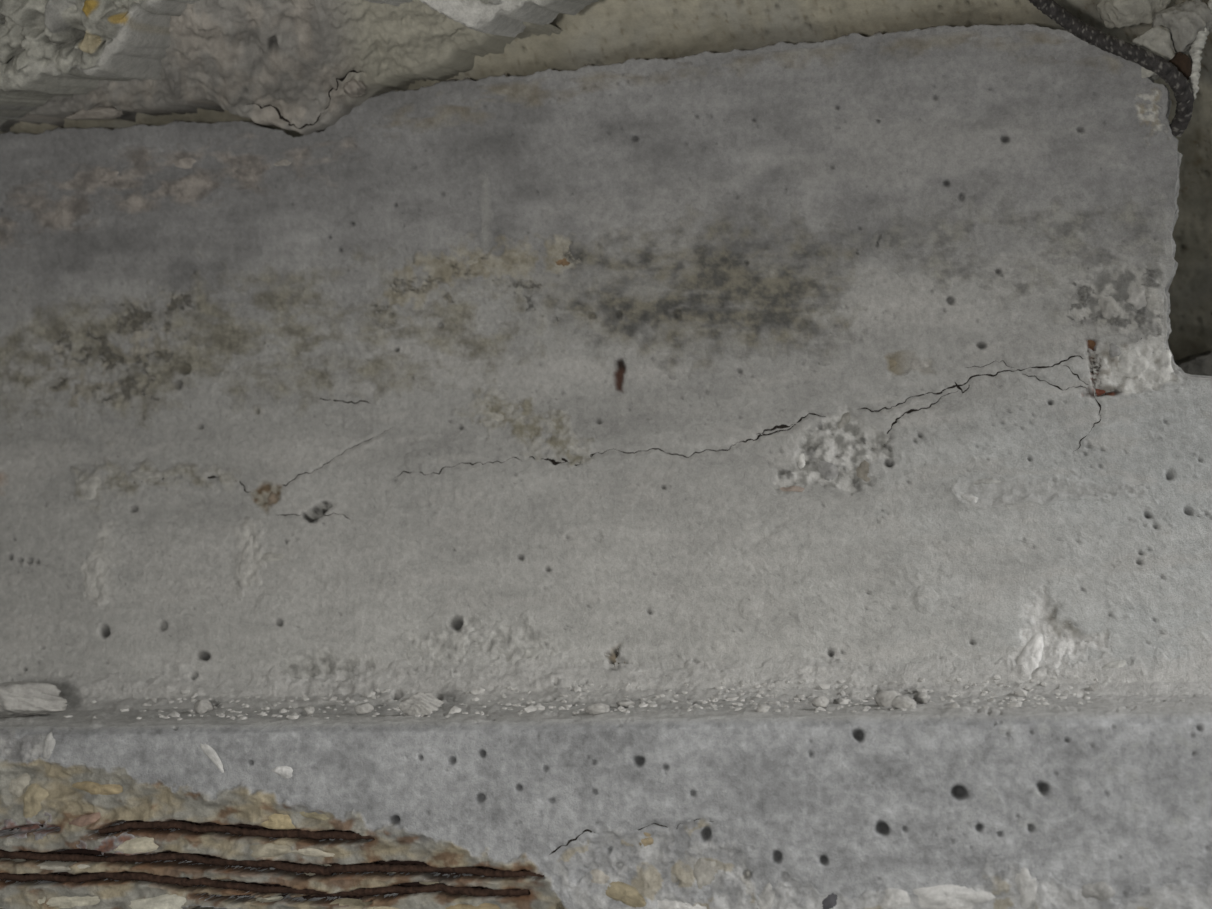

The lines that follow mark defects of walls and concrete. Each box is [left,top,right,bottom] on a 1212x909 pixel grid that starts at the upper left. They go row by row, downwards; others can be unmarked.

corrosion [1168,52,1192,81]
spalling [1188,27,1210,99]
crack [861,356,1101,453]
crack [394,413,825,478]
corrosion [0,812,61,840]
corrosion [76,830,154,856]
spalling [0,727,1212,909]